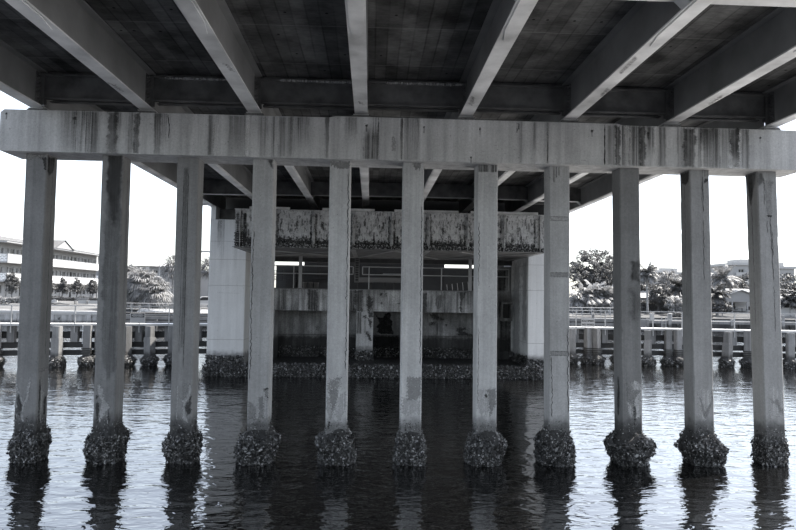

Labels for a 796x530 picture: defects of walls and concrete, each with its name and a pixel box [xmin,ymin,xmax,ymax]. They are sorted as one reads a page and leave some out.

damp [107,112,121,144]
damp [615,125,665,165]
damp [682,128,718,166]
damp [729,128,748,158]
peeling [363,293,399,357]
peeling [14,379,46,422]
peeling [95,384,110,426]
peeling [627,380,642,418]
peeling [697,389,713,421]